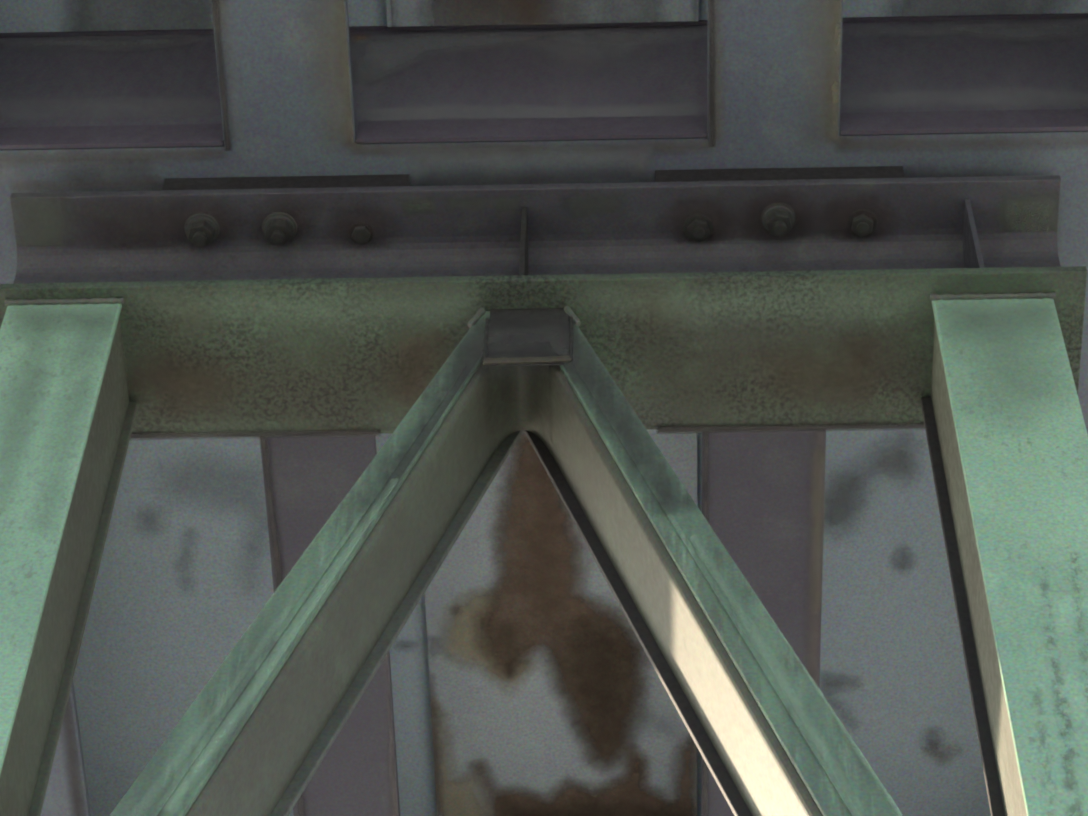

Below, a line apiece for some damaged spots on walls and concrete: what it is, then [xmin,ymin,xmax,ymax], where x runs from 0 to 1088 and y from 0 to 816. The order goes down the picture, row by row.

corrosion [430,0,657,27]
corrosion [433,433,697,816]